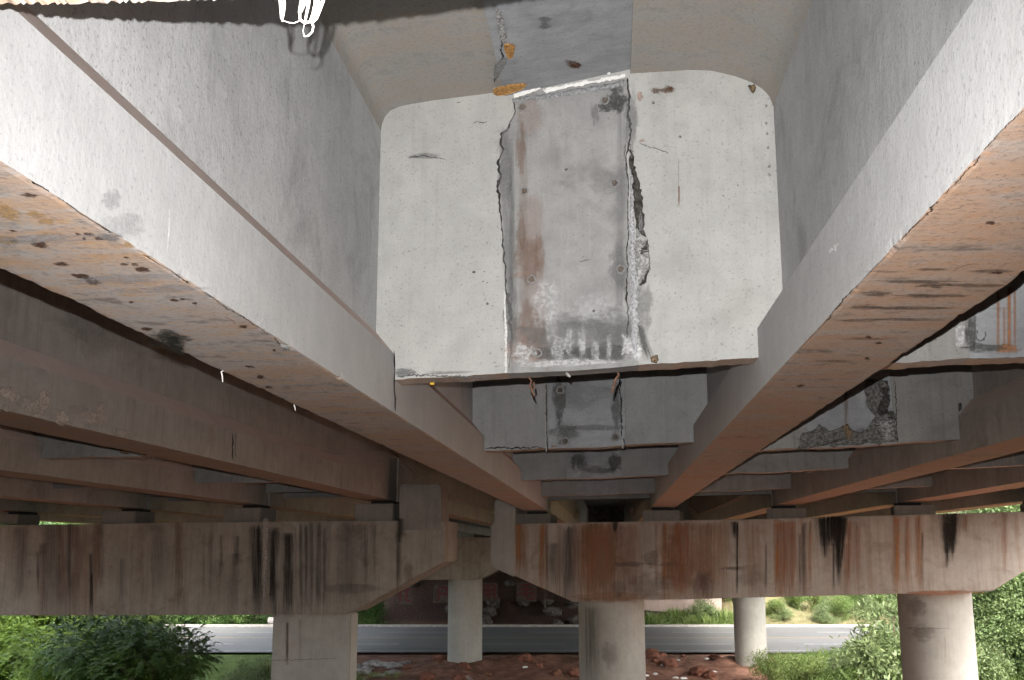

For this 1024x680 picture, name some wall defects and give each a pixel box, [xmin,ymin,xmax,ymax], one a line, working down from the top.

rust [493,83,527,96]
peeling [513,72,625,98]
spalling [629,144,651,286]
crack [393,102,516,412]
leakage [571,326,649,361]
rust [997,288,1016,352]
spalling [797,379,899,449]
leakage [252,519,320,610]
leakage [819,516,847,584]
leakage [942,513,960,562]